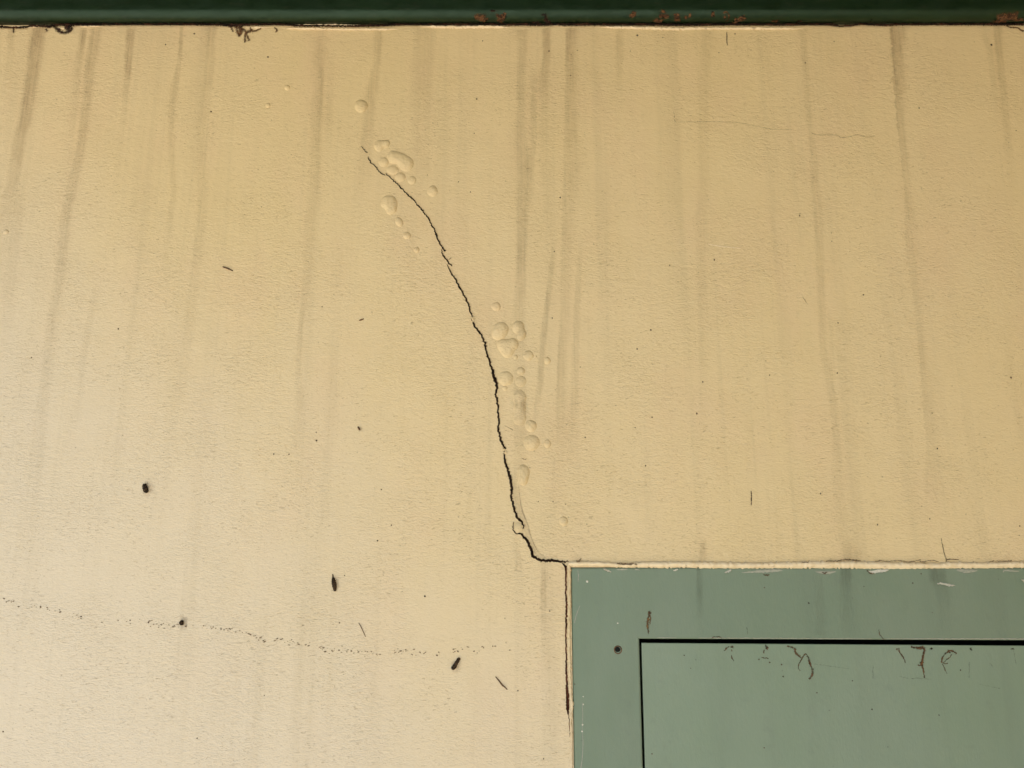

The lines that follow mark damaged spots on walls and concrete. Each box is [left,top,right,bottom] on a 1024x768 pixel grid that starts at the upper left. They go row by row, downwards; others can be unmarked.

crack [360,146,571,737]